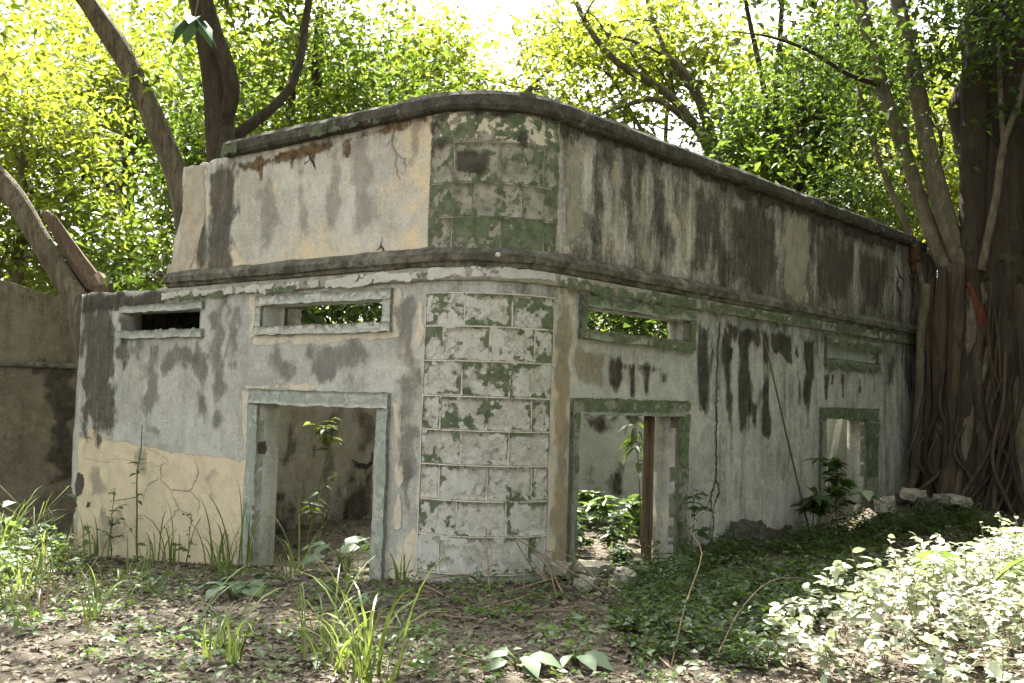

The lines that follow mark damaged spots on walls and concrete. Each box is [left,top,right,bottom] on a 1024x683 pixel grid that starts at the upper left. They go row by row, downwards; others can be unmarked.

leakage [196,162,240,269]
crack [386,125,406,178]
leakage [430,111,448,152]
leakage [475,111,509,129]
peeling [427,112,561,253]
leakage [538,116,896,312]
leakage [32,290,240,483]
peeling [374,291,555,582]
leakage [697,321,834,437]
crack [143,461,200,529]